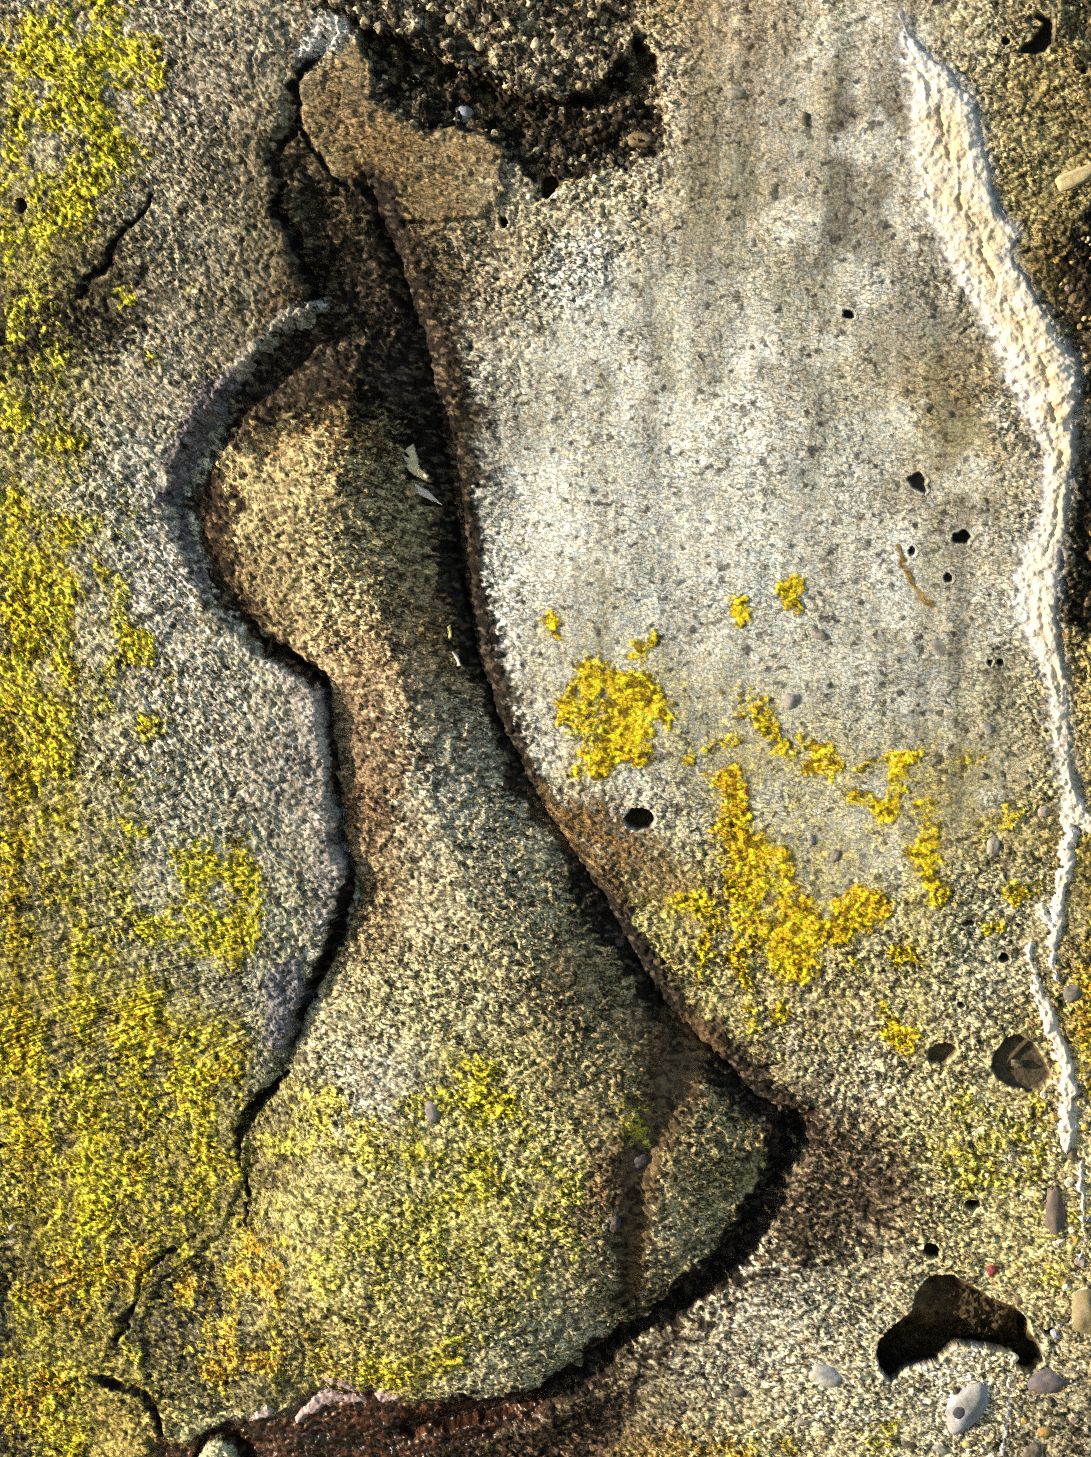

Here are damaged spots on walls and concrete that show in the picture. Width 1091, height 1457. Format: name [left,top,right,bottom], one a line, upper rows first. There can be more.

crack [81,193,153,295]
crack [210,579,356,1019]
crack [234,1070,291,1228]
crack [89,1234,254,1457]
spalling [874,1272,1048,1386]